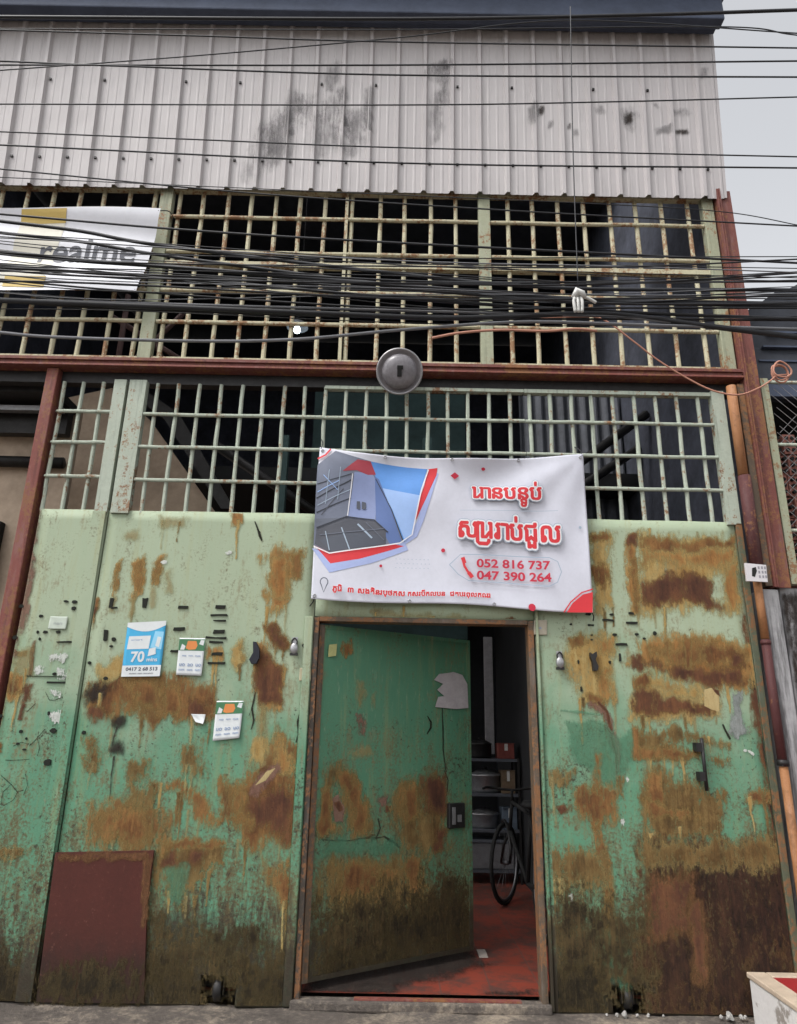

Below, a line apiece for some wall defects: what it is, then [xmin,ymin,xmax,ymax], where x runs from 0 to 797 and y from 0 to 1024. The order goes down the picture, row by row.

corrosion [231,513,243,559]
corrosion [0,542,306,1008]
corrosion [317,759,452,863]
corrosion [548,528,794,1015]